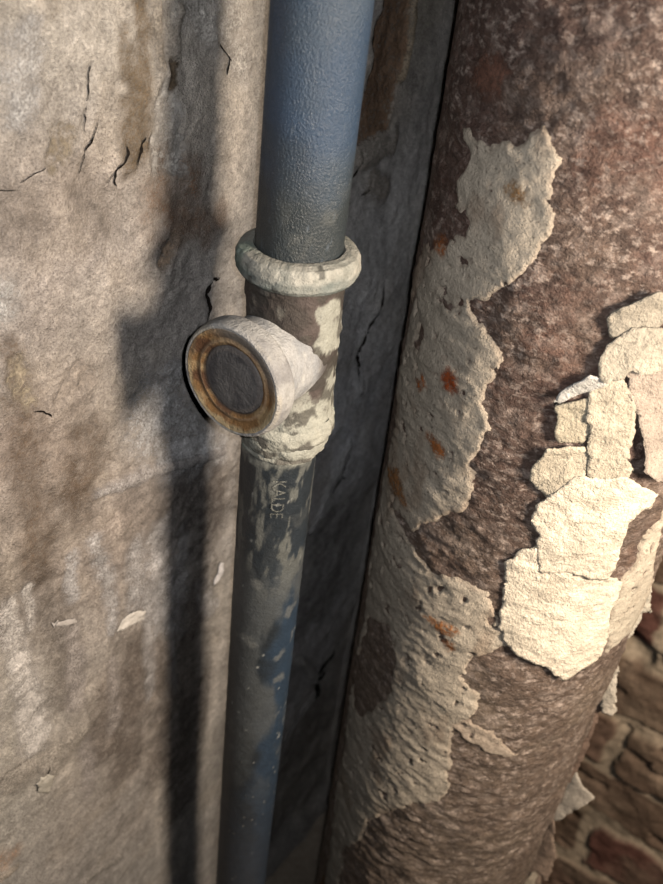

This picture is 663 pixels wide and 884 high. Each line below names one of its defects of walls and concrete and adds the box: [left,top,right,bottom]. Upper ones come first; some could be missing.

crack [78,66,98,176]
crack [108,138,146,186]
leakage [120,0,154,174]
leakage [186,0,248,83]
spalling [357,0,412,146]
crack [205,277,220,321]
corrosion [441,369,458,393]
peeling [498,291,663,681]
peeling [524,666,620,884]